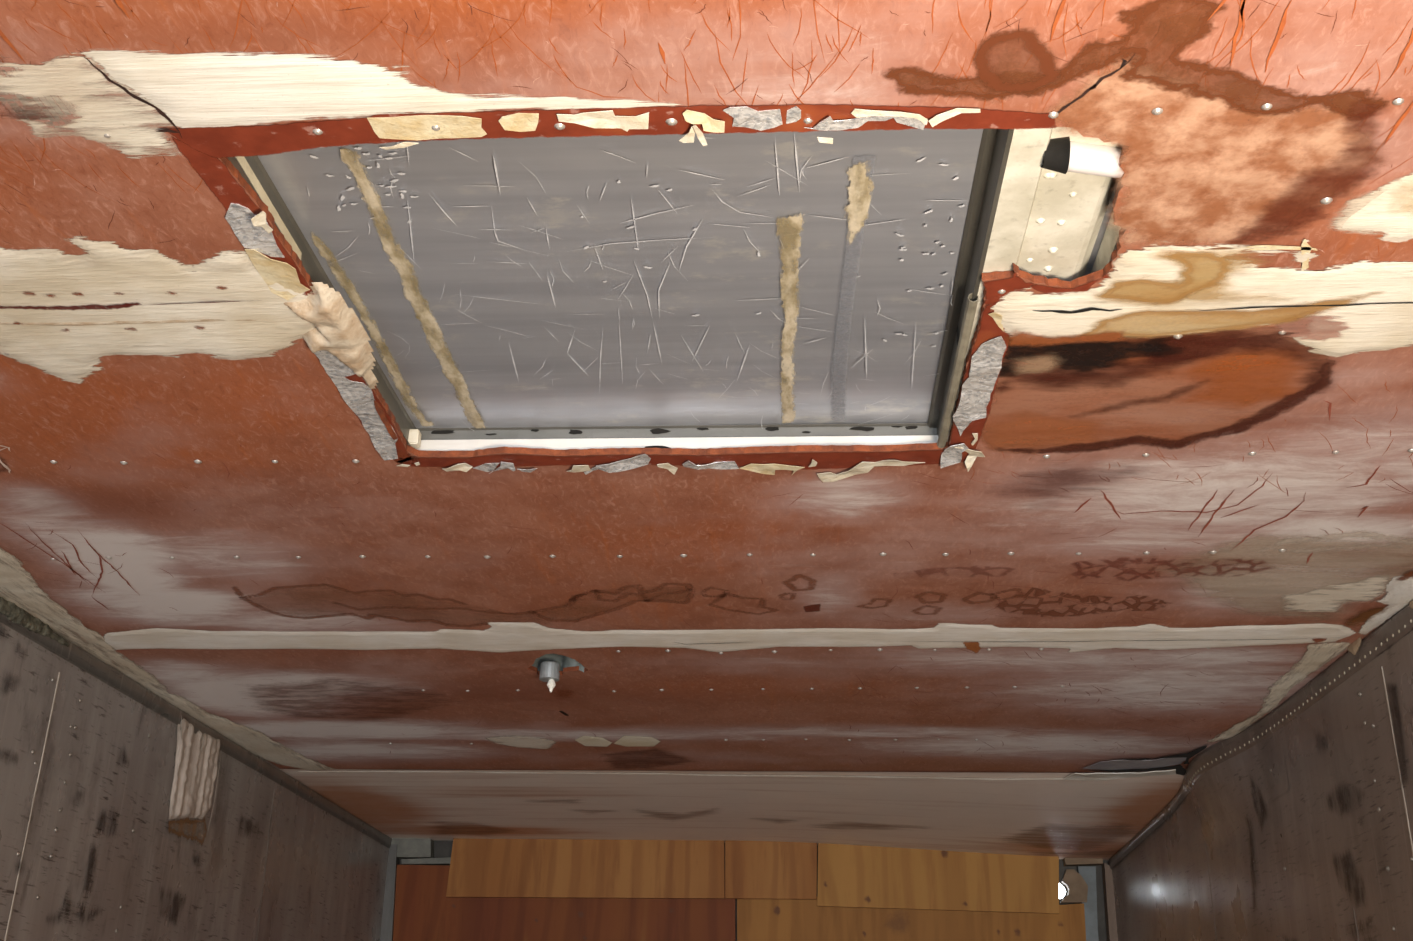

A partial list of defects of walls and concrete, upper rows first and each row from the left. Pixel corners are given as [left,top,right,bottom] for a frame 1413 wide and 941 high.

peeling [0,53,174,159]
peeling [367,113,539,150]
peeling [557,110,649,132]
peeling [679,106,981,146]
leakage [885,0,1387,454]
peeling [443,462,537,474]
peeling [566,454,925,482]
leakage [233,574,820,627]
peeling [1283,576,1413,634]